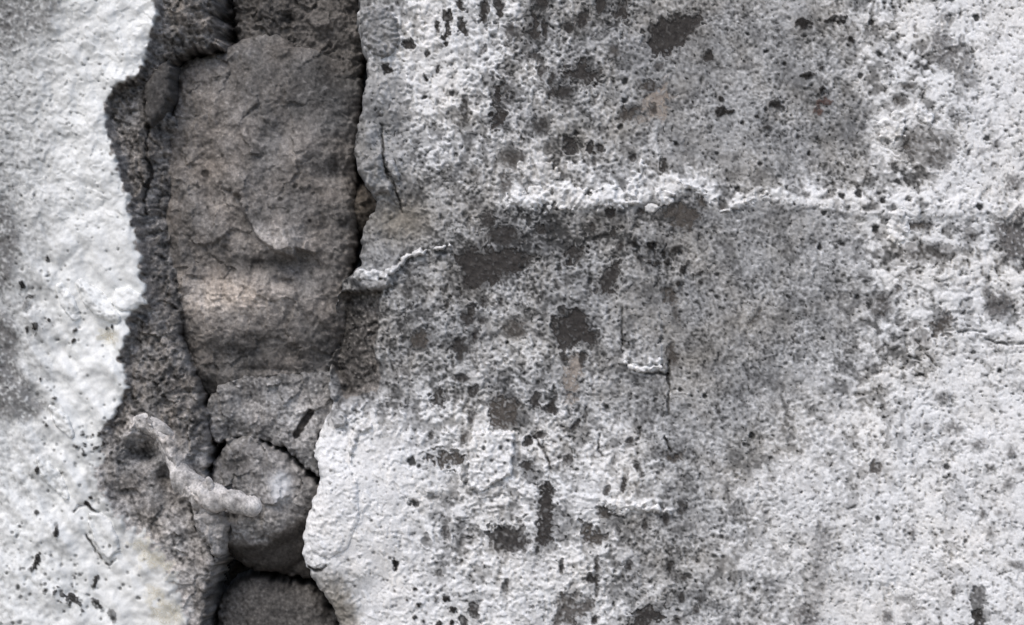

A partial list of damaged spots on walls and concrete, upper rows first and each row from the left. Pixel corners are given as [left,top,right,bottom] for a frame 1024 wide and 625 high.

spalling [88,0,236,625]
crack [647,360,670,410]
spalling [293,409,314,438]
flaking render [331,412,373,462]